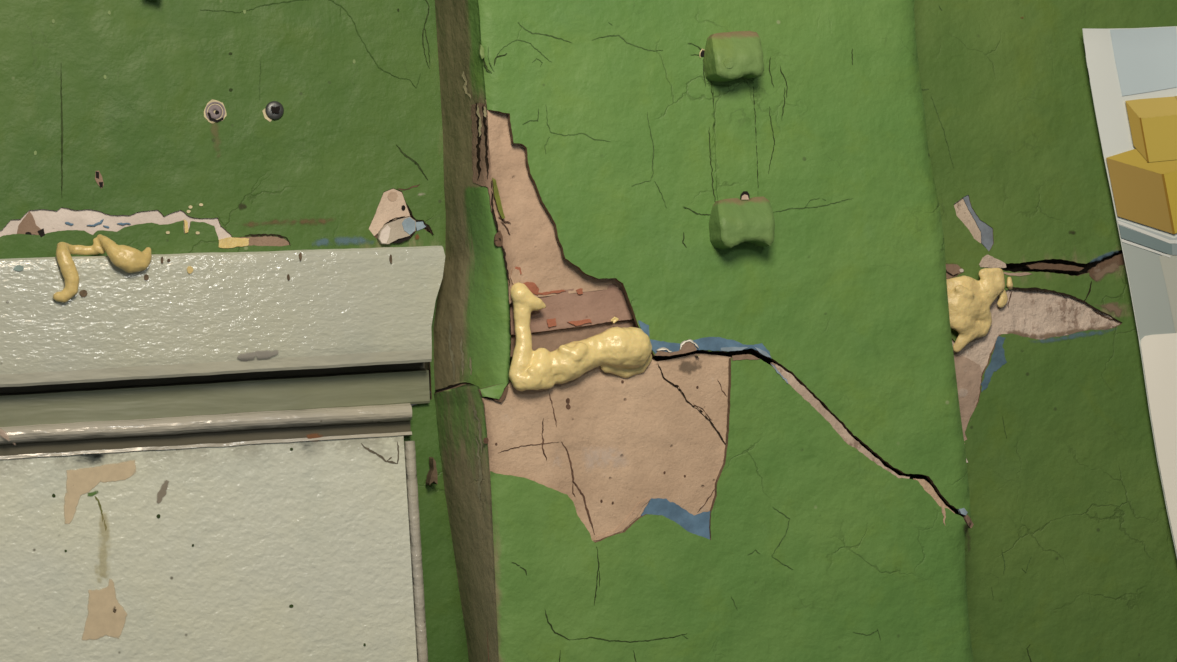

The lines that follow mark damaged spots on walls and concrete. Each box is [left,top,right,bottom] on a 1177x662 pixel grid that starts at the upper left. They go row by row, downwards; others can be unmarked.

peeling [0,203,302,261]
spalling [369,184,434,264]
spalling [462,71,637,357]
spalling [954,195,1006,268]
spalling [946,264,964,279]
crack [1001,250,1125,301]
spalling [952,287,1121,444]
spalling [482,354,732,542]
crack [638,321,974,551]
peeling [64,460,136,524]
crack [748,509,793,570]
peeling [82,579,127,640]